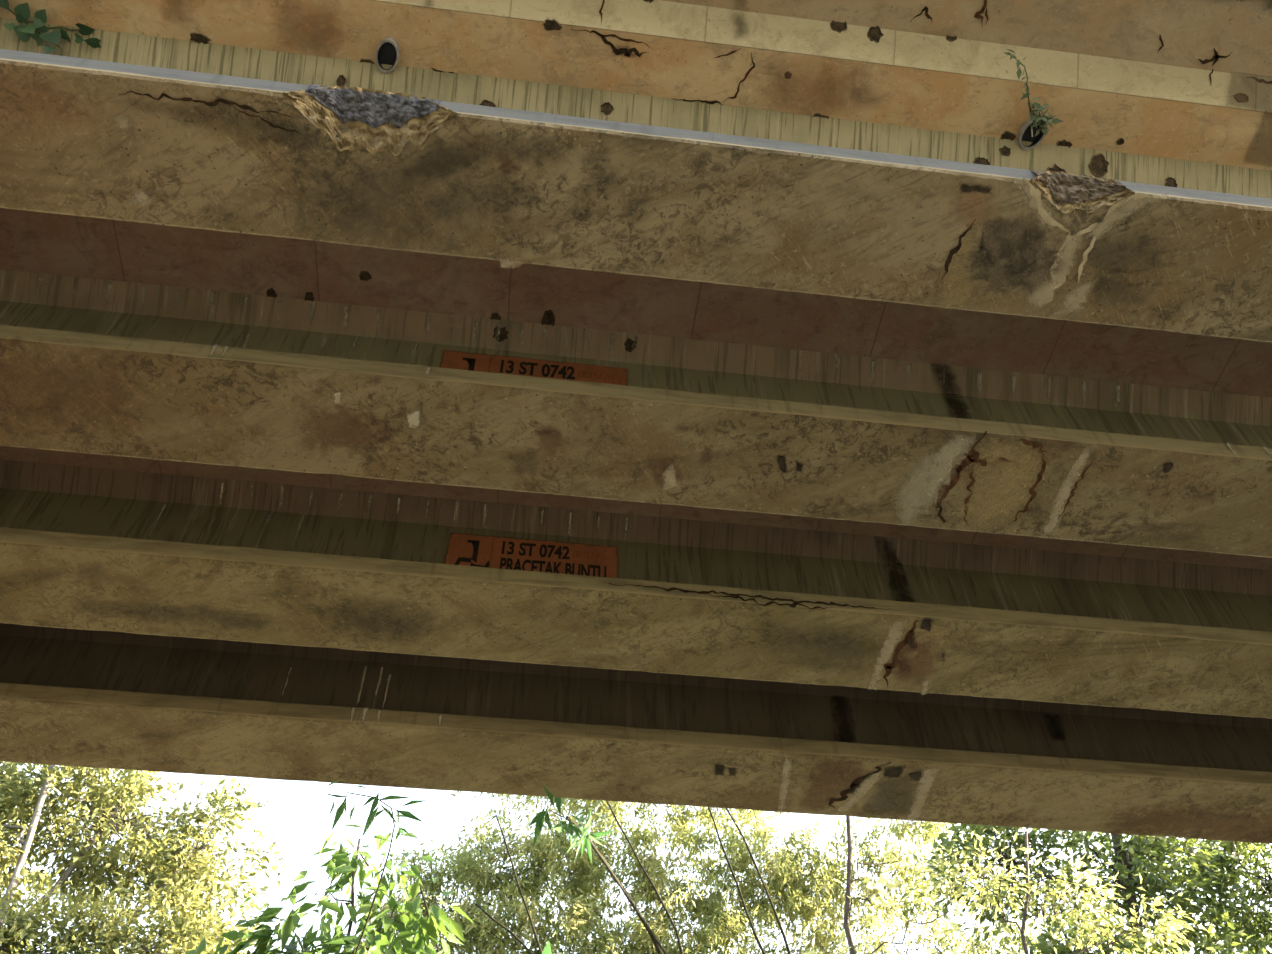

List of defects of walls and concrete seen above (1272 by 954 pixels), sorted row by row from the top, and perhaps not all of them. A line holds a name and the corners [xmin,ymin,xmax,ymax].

crack [570,0,650,57]
crack [672,48,755,105]
crack [118,91,302,135]
spalling [201,75,528,171]
spalling [1030,153,1135,214]
leakage [933,363,969,419]
leakage [1043,452,1096,534]
leakage [884,541,914,602]
crack [609,583,945,694]
crack [828,762,922,812]